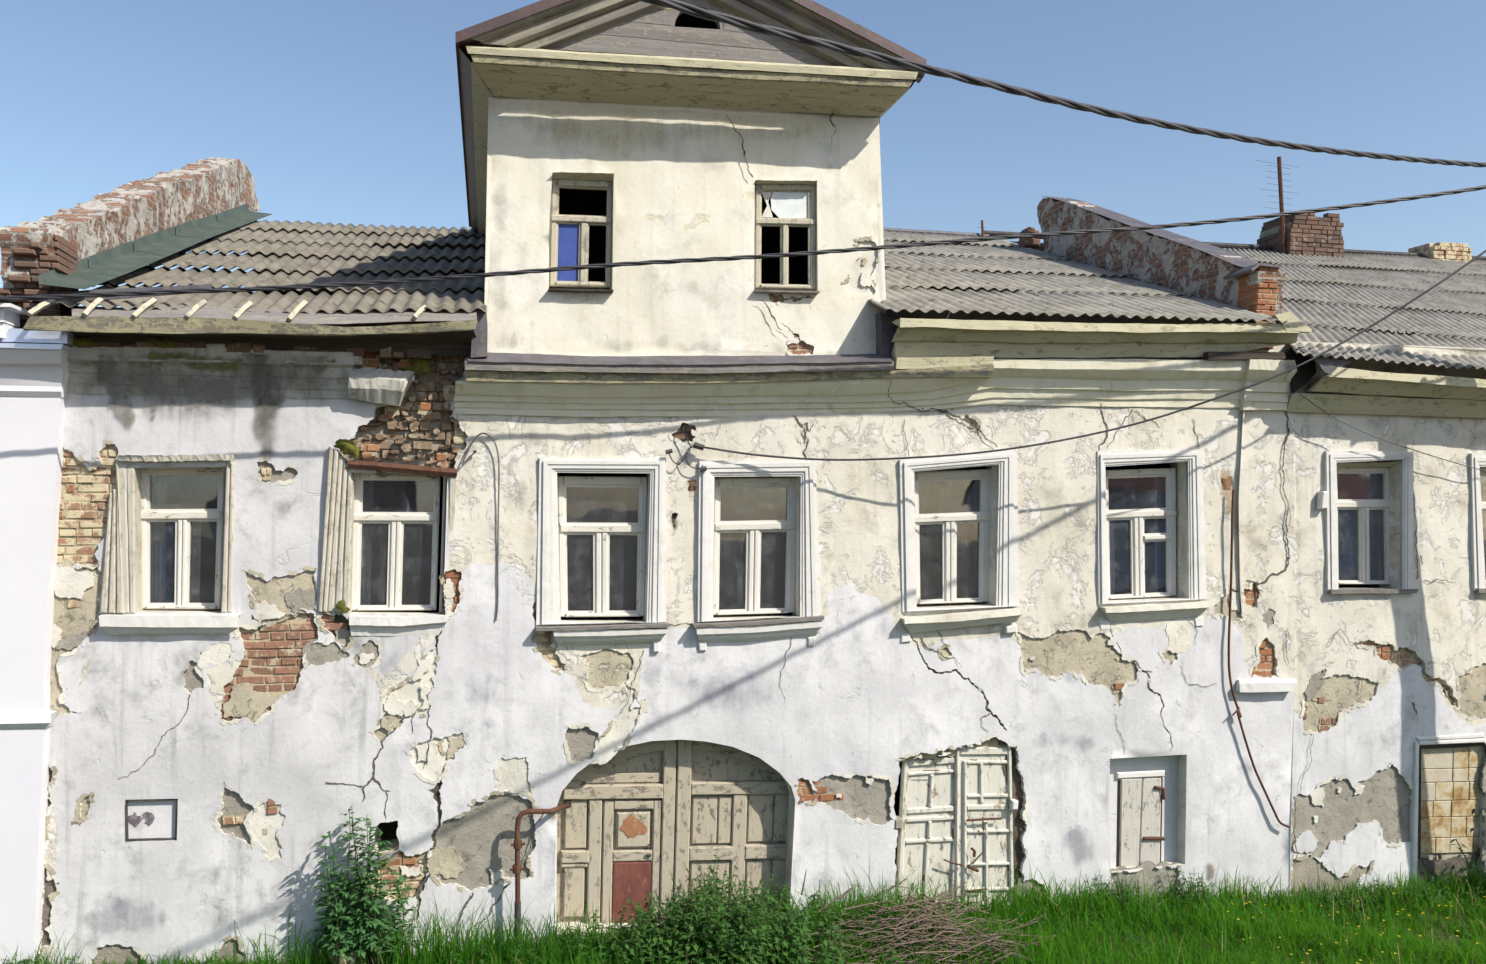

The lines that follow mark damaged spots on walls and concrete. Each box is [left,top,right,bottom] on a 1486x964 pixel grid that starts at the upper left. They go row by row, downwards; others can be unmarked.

damp [92,351,335,458]
crack [1247,412,1290,584]
flaking render [50,440,118,718]
flaking render [183,565,384,726]
crack [435,596,446,647]
peeling [531,602,649,767]
crack [910,630,1006,731]
crack [326,695,442,918]
flaking render [368,753,537,905]
crack [457,814,544,940]
flaking render [792,733,1051,901]
flaking render [1290,761,1413,896]